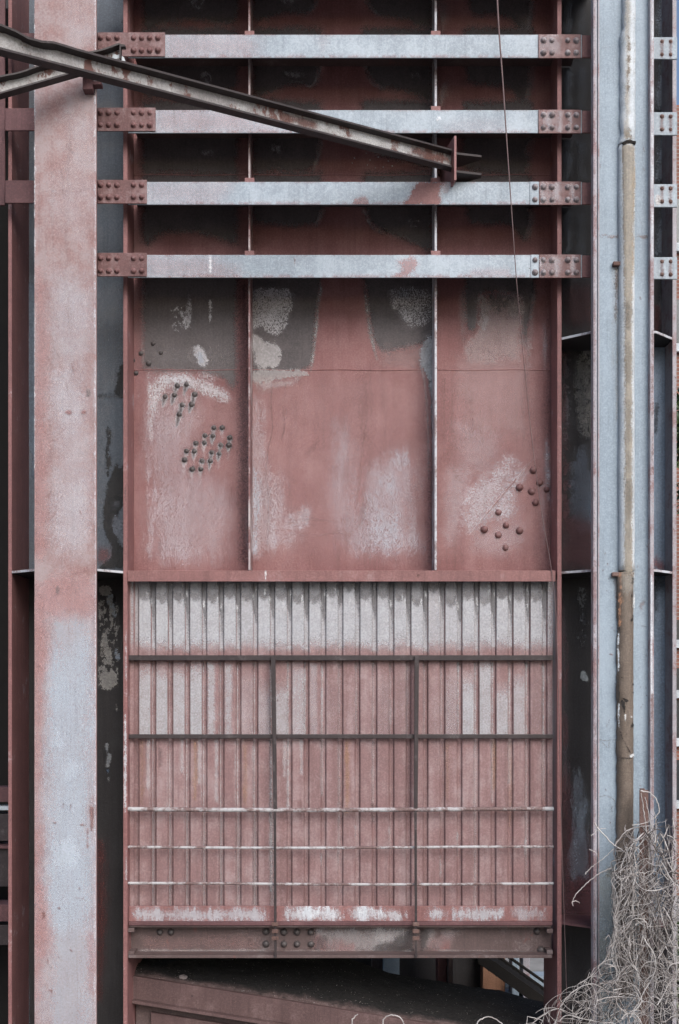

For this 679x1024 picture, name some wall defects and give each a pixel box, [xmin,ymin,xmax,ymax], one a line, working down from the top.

corrosion [405,182,441,204]
peeling [253,278,321,377]
peeling [98,582,552,690]